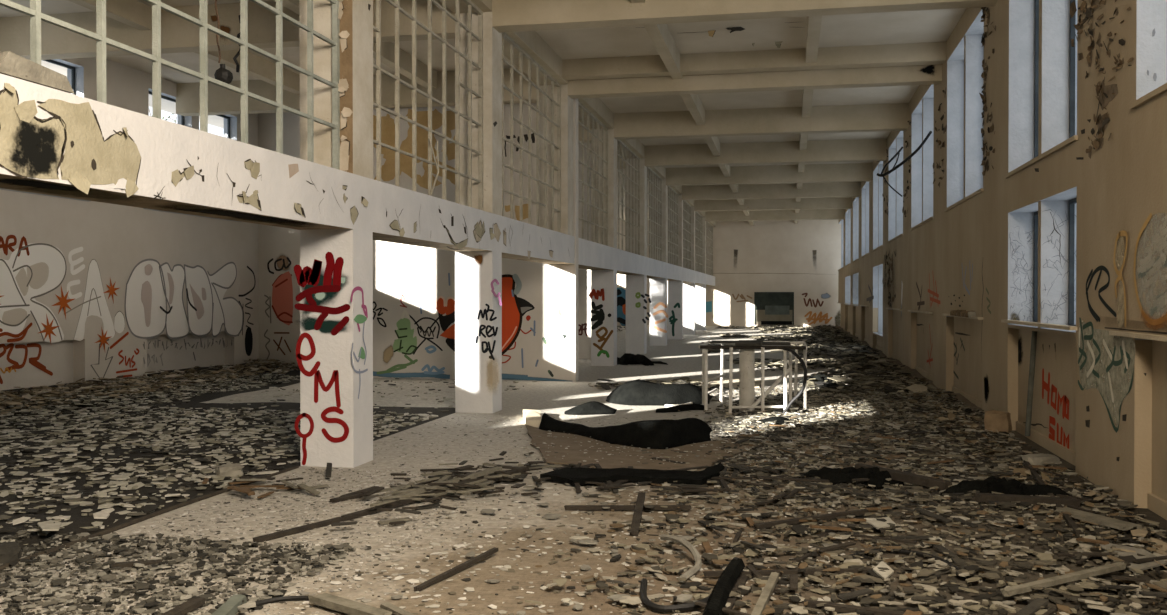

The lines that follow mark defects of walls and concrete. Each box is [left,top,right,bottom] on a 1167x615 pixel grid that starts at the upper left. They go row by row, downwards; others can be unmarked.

peeling [979,7,996,176]
peeling [1070,0,1134,160]
peeling [0,83,141,198]
peeling [171,157,204,187]
peeling [233,159,262,211]
peeling [373,108,455,189]
peeling [504,133,535,157]
peeling [386,211,417,237]
peeling [439,209,507,249]